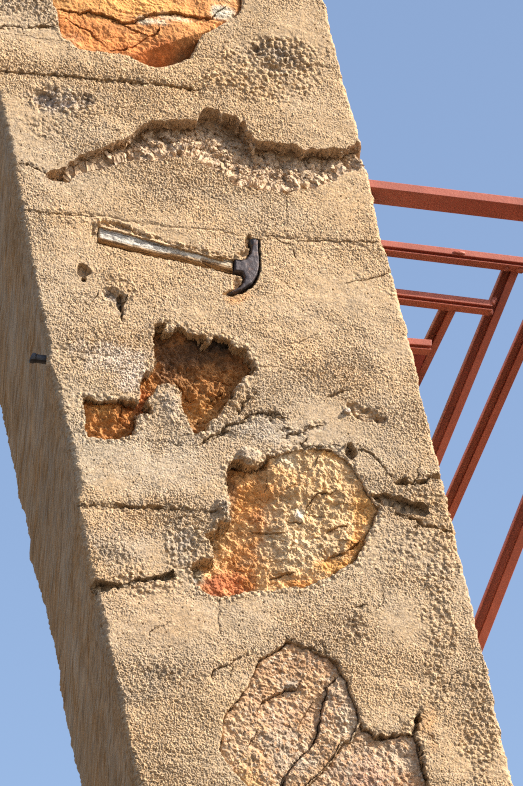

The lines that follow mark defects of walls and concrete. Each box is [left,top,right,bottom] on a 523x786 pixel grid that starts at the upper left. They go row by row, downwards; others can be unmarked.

spalling [43,105,366,195]
crack [412,522,455,536]